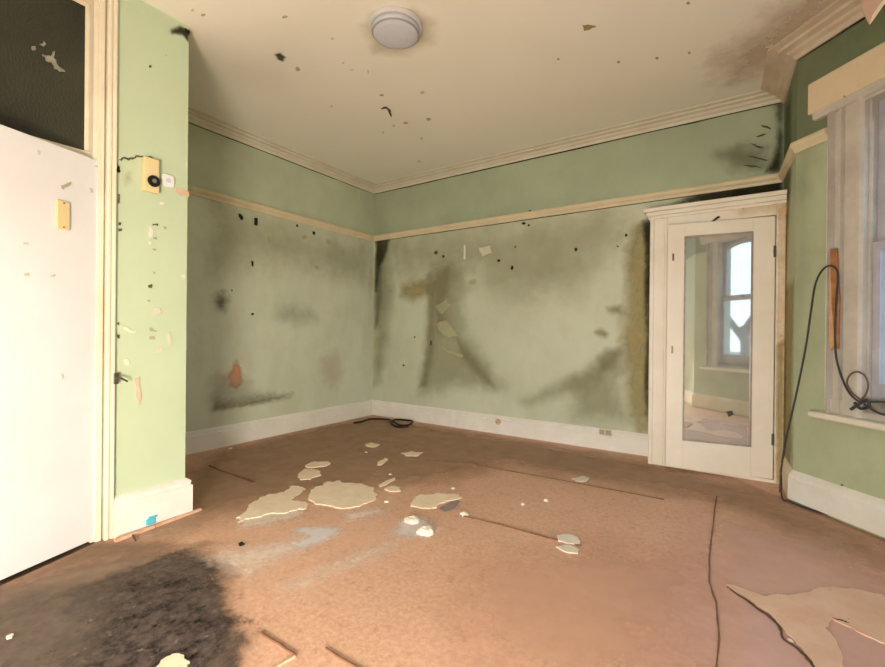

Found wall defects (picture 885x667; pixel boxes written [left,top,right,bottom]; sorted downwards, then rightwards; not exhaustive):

leakage [375,239,389,291]
leakage [627,220,650,429]
leakage [683,102,791,266]